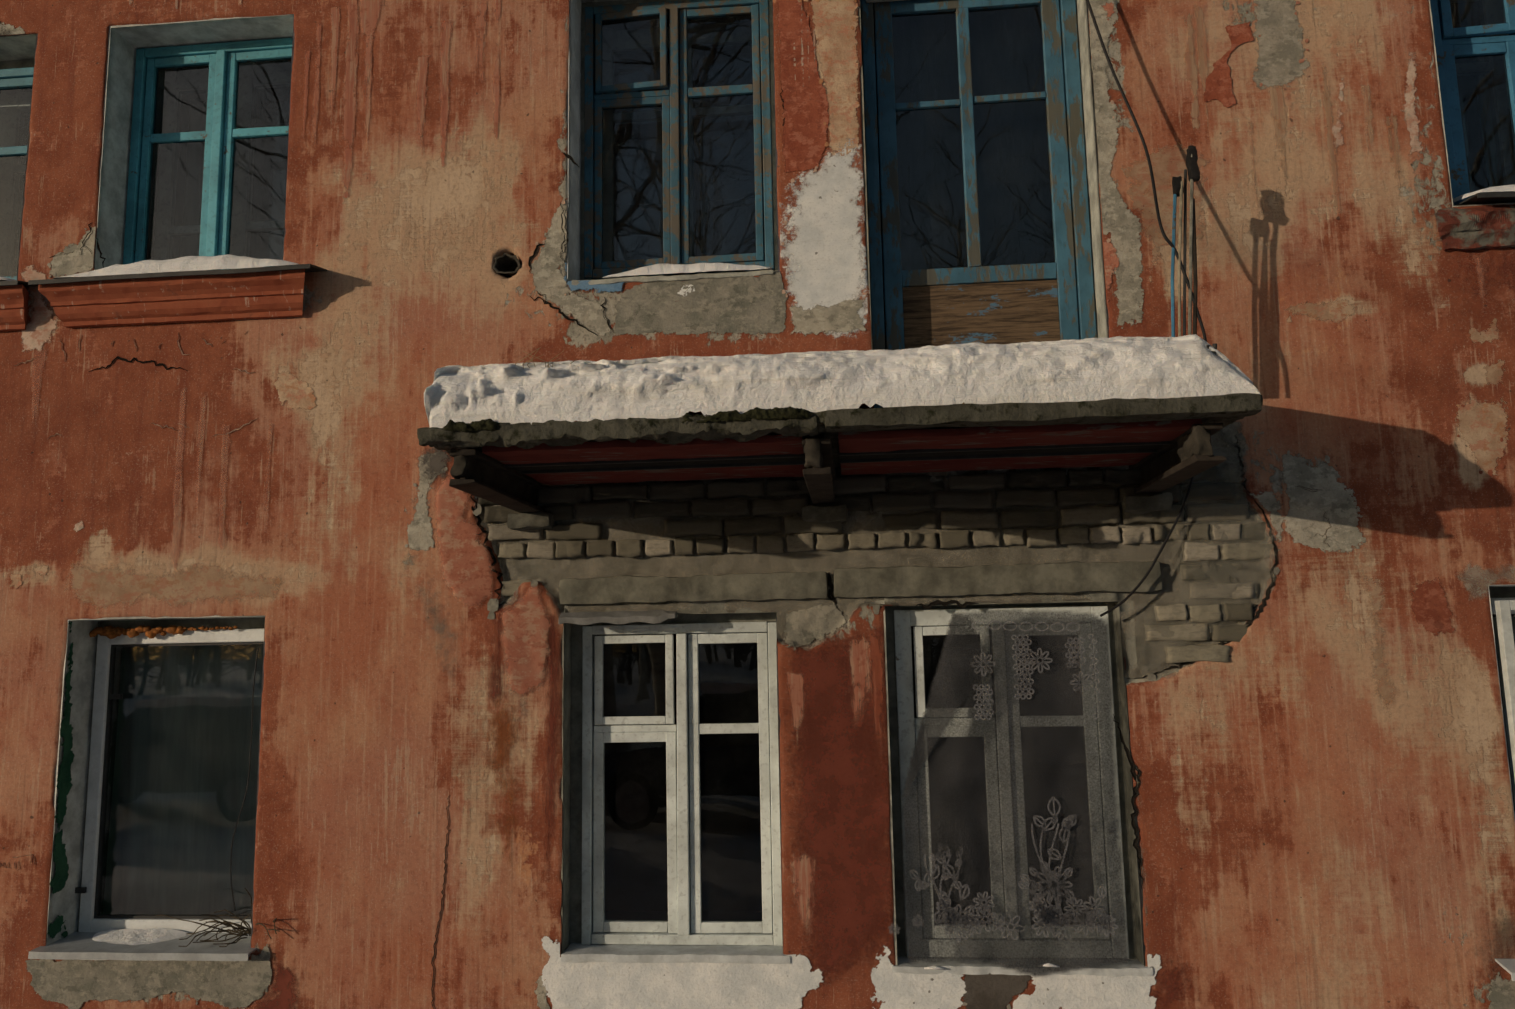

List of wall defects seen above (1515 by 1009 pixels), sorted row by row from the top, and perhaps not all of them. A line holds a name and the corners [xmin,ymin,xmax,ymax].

peeling [1204,0,1310,108]
peeling [1402,52,1423,154]
peeling [776,0,868,338]
peeling [1121,145,1206,265]
spalling [493,253,521,278]
peeling [563,262,624,293]
peeling [1103,238,1119,303]
crack [88,356,187,372]
spalling [470,465,1285,680]
peeling [541,936,824,1009]
peeling [870,946,1162,1009]